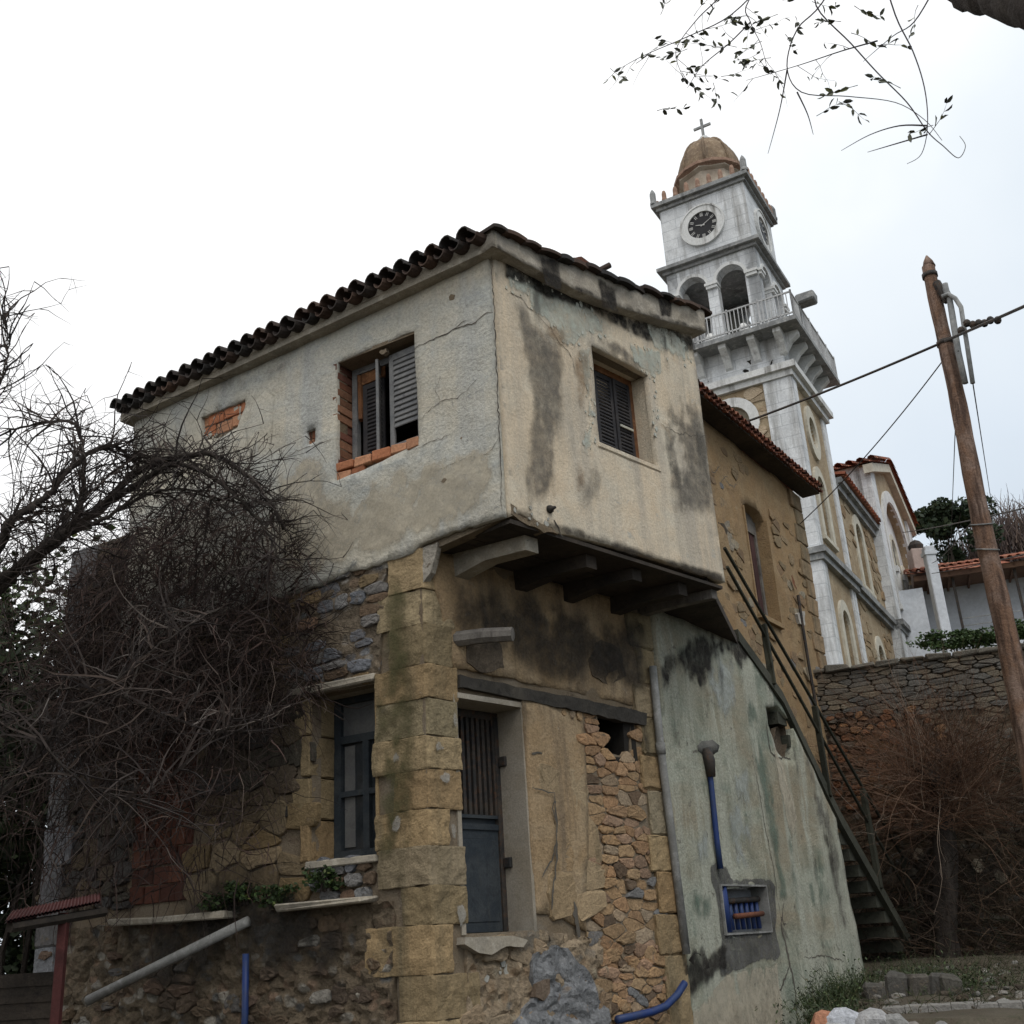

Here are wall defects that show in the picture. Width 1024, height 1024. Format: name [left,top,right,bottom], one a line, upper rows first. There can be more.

spalling [204,402,246,441]
crack [416,257,575,507]
damp [506,257,695,494]
damp [667,413,710,507]
damp [457,591,644,687]
damp [662,636,747,713]
spalling [576,713,669,1011]